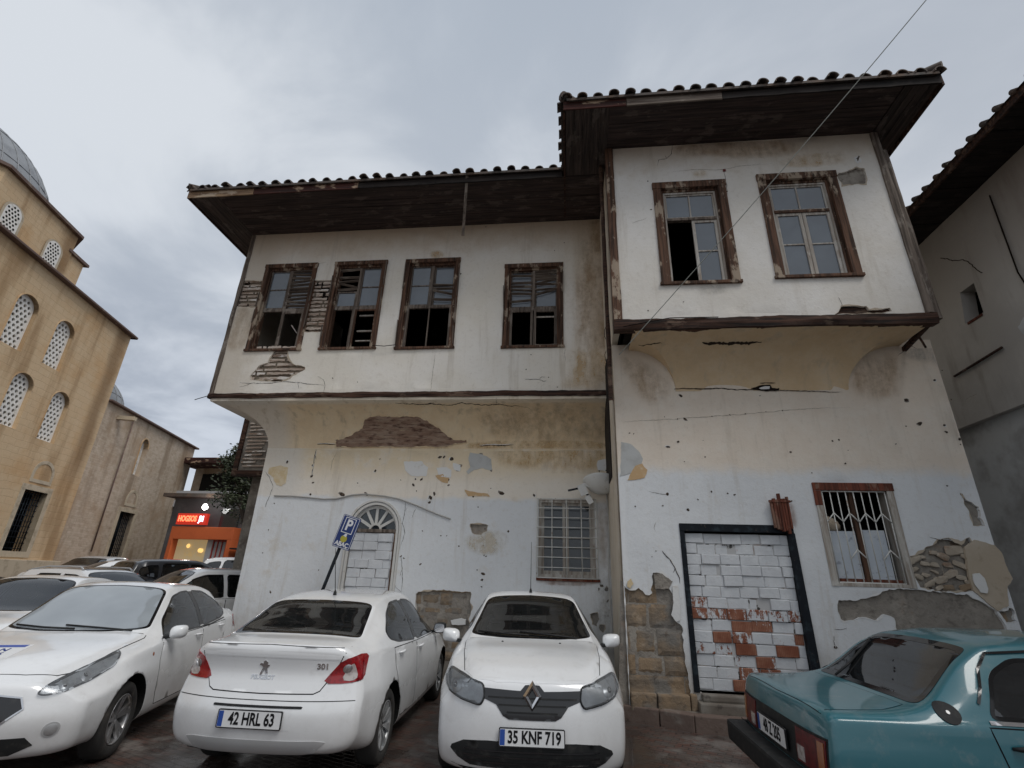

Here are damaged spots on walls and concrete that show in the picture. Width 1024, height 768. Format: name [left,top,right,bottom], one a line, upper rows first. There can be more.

flaking render [837,155,867,187]
crack [702,339,761,347]
crack [630,382,846,422]
peeling [404,456,462,504]
peeling [628,464,647,480]
flaking render [837,493,1016,630]
flaking render [415,569,485,681]
flaking render [598,571,691,705]